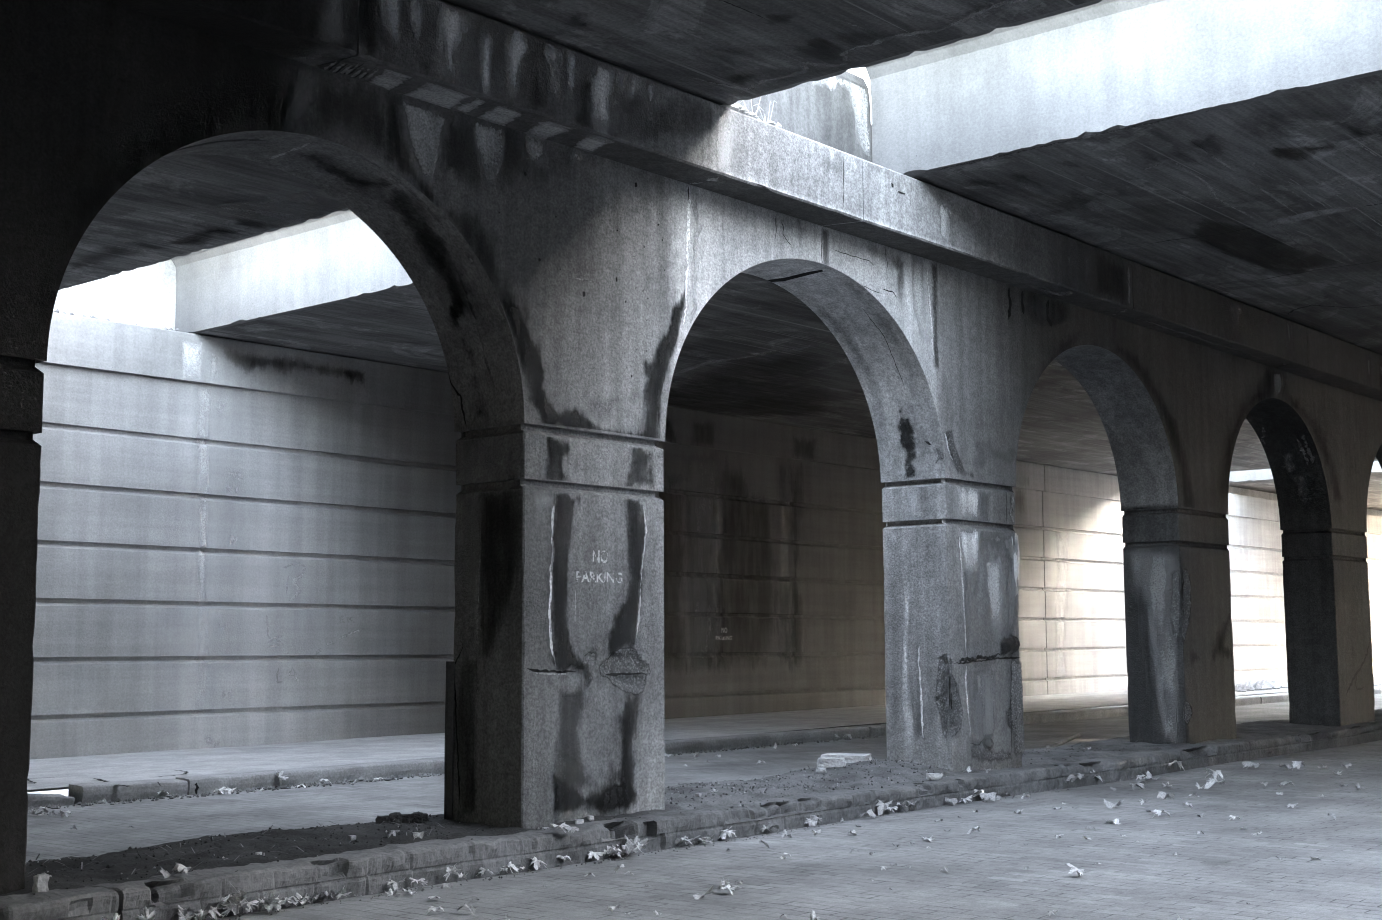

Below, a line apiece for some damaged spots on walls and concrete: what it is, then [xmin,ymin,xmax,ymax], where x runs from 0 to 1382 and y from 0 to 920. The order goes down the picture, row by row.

damp [439,6,467,70]
damp [481,38,489,85]
damp [507,30,527,86]
damp [1273,147,1322,160]
damp [1196,221,1335,273]
damp [900,411,915,477]
spalling [504,292,685,813]
crack [527,664,591,686]
damp [558,688,588,789]
spalling [936,655,963,738]
spalling [971,660,1025,762]